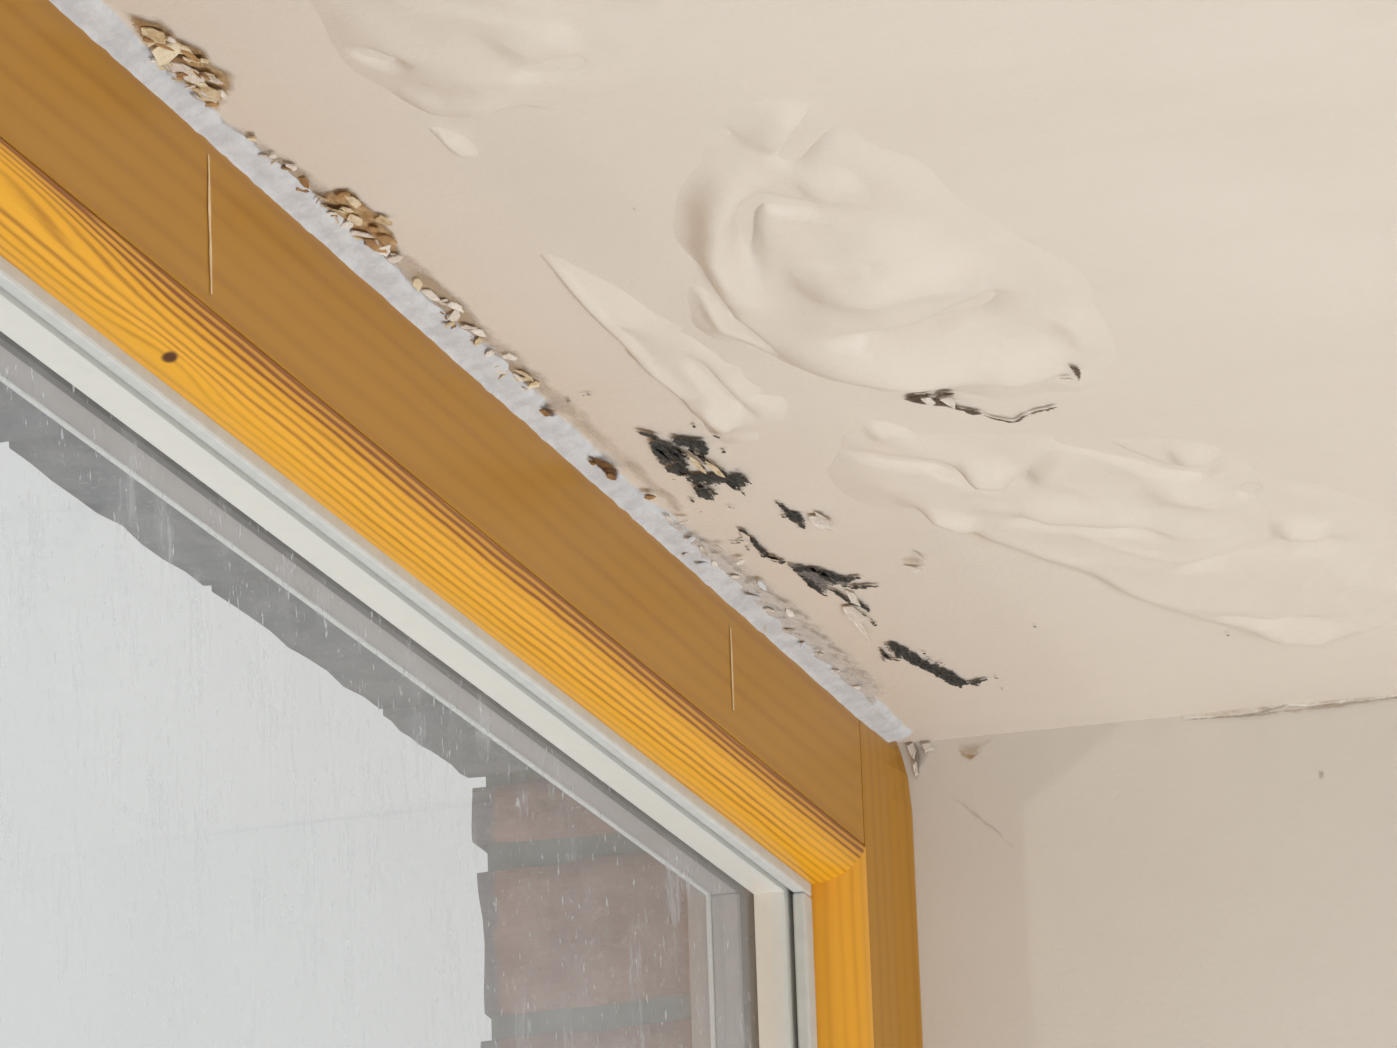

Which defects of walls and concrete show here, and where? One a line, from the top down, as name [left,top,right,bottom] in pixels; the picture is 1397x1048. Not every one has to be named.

spalling [134,18,231,108]
peeling [246,136,403,263]
peeling [413,277,540,391]
water stain [637,425,752,512]
water stain [775,502,834,531]
water stain [731,529,1003,690]